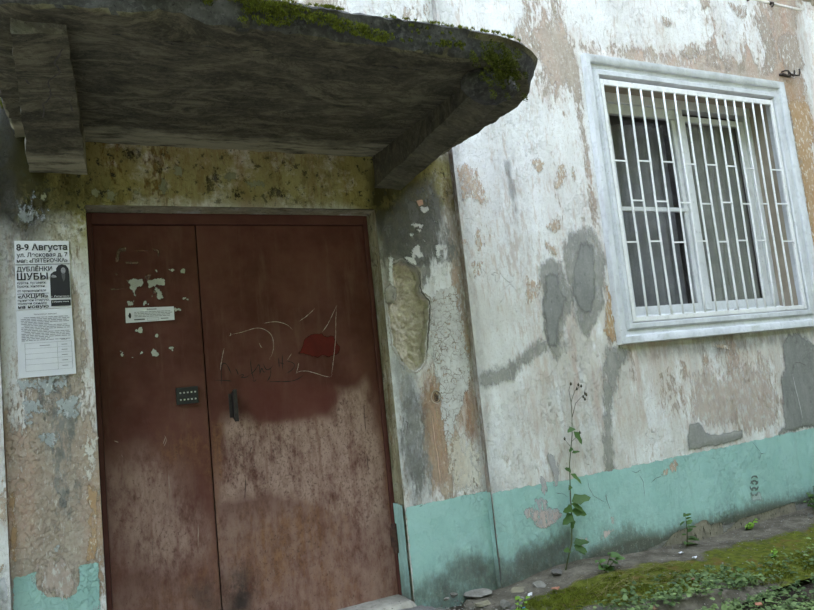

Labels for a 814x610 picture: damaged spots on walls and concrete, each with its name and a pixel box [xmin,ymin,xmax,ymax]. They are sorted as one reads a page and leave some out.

peeling [514,0,541,59]
peeling [681,41,745,70]
peeling [788,100,814,244]
flaking render [383,222,432,373]
crack [429,285,472,483]
peeling [80,432,99,481]
peeling [524,452,562,529]
peeling [34,559,74,600]